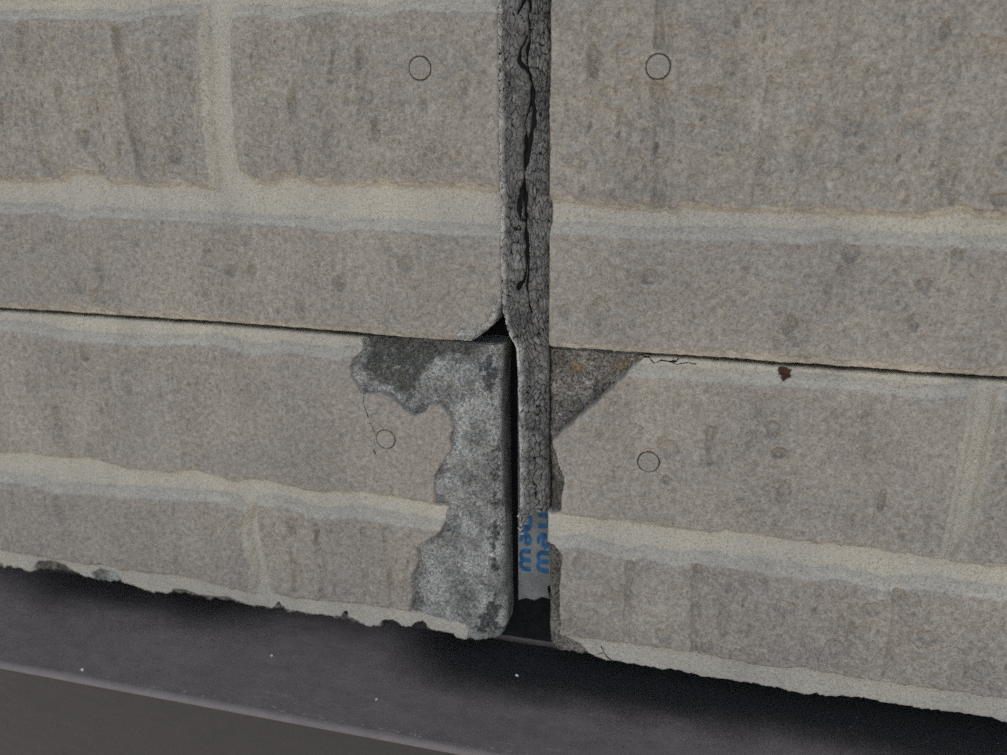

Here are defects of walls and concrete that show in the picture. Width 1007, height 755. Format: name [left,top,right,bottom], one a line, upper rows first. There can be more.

spalling [352,298,527,640]
crack [498,0,551,524]
spalling [550,347,644,509]
corrosion [778,367,792,381]